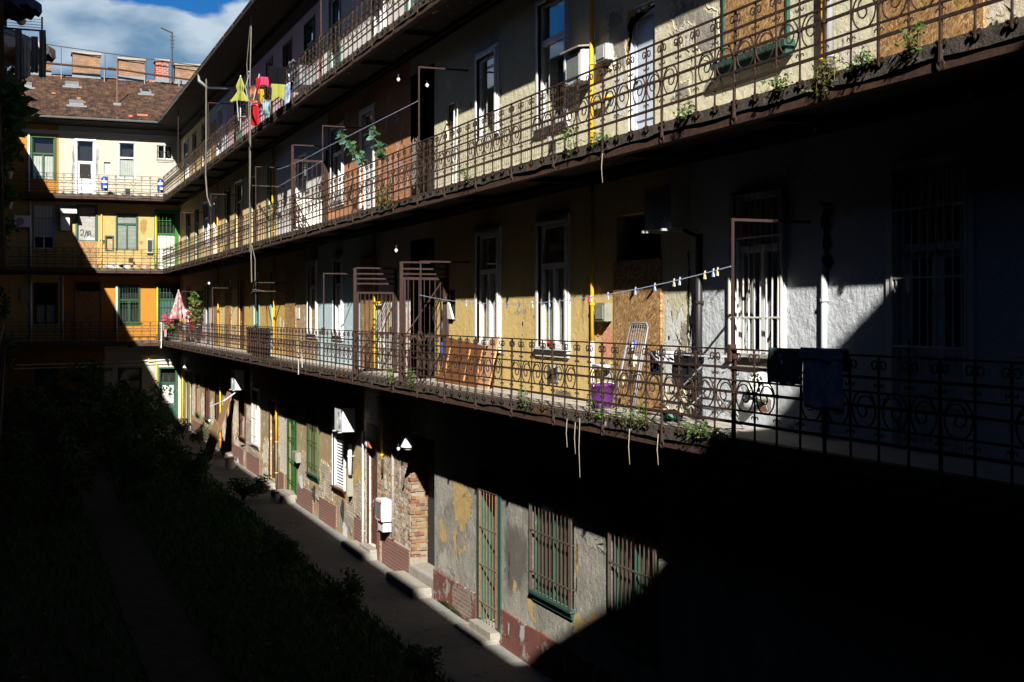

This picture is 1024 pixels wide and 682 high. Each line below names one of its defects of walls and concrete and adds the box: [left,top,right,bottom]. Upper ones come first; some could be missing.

peeling [436,476,474,619]
peeling [527,597,540,626]